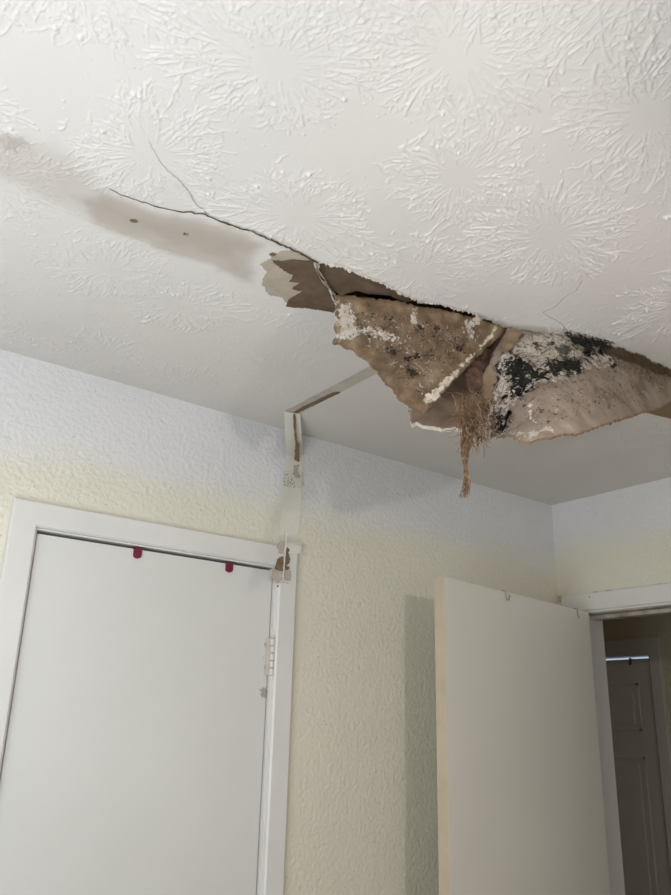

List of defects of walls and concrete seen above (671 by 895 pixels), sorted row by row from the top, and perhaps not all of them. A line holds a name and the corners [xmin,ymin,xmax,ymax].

crack [109,141,319,263]
spalling [319,271,507,329]
leakage [487,329,671,436]
peeling [270,367,377,587]